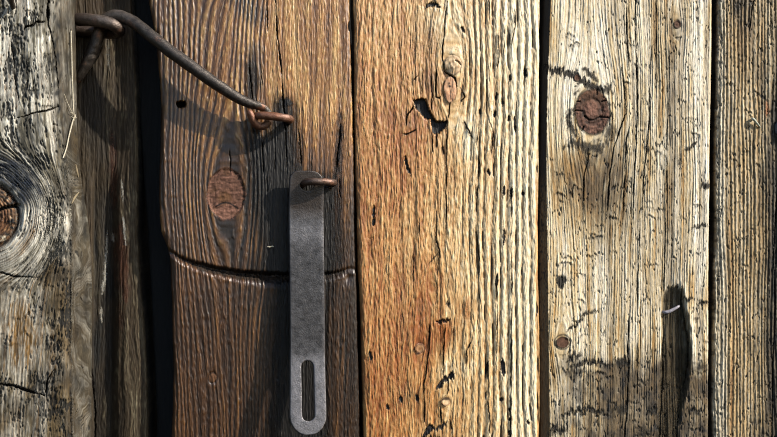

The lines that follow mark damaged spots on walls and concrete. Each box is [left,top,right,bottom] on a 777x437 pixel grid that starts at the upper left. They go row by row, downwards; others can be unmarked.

crack [9,0,58,125]
crack [404,11,494,273]
crack [497,13,516,67]
crack [607,0,670,210]
crack [476,231,513,301]
crack [0,370,54,396]